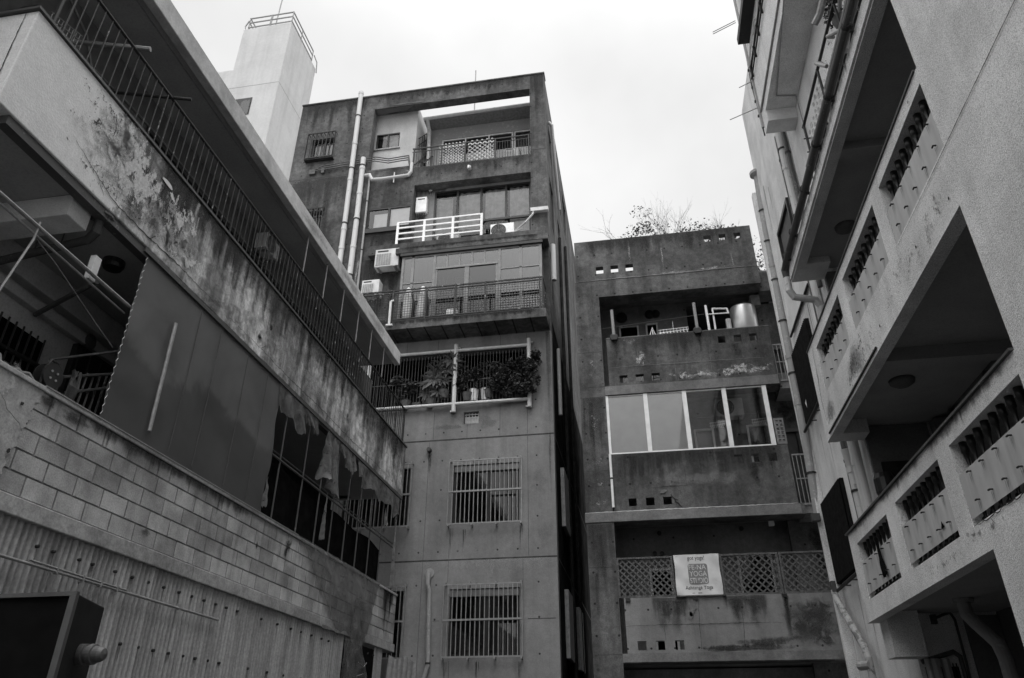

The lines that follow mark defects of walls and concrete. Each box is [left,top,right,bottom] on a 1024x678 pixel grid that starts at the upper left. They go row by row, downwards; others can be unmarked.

leakage [132,162,402,459]
leakage [704,595,834,650]